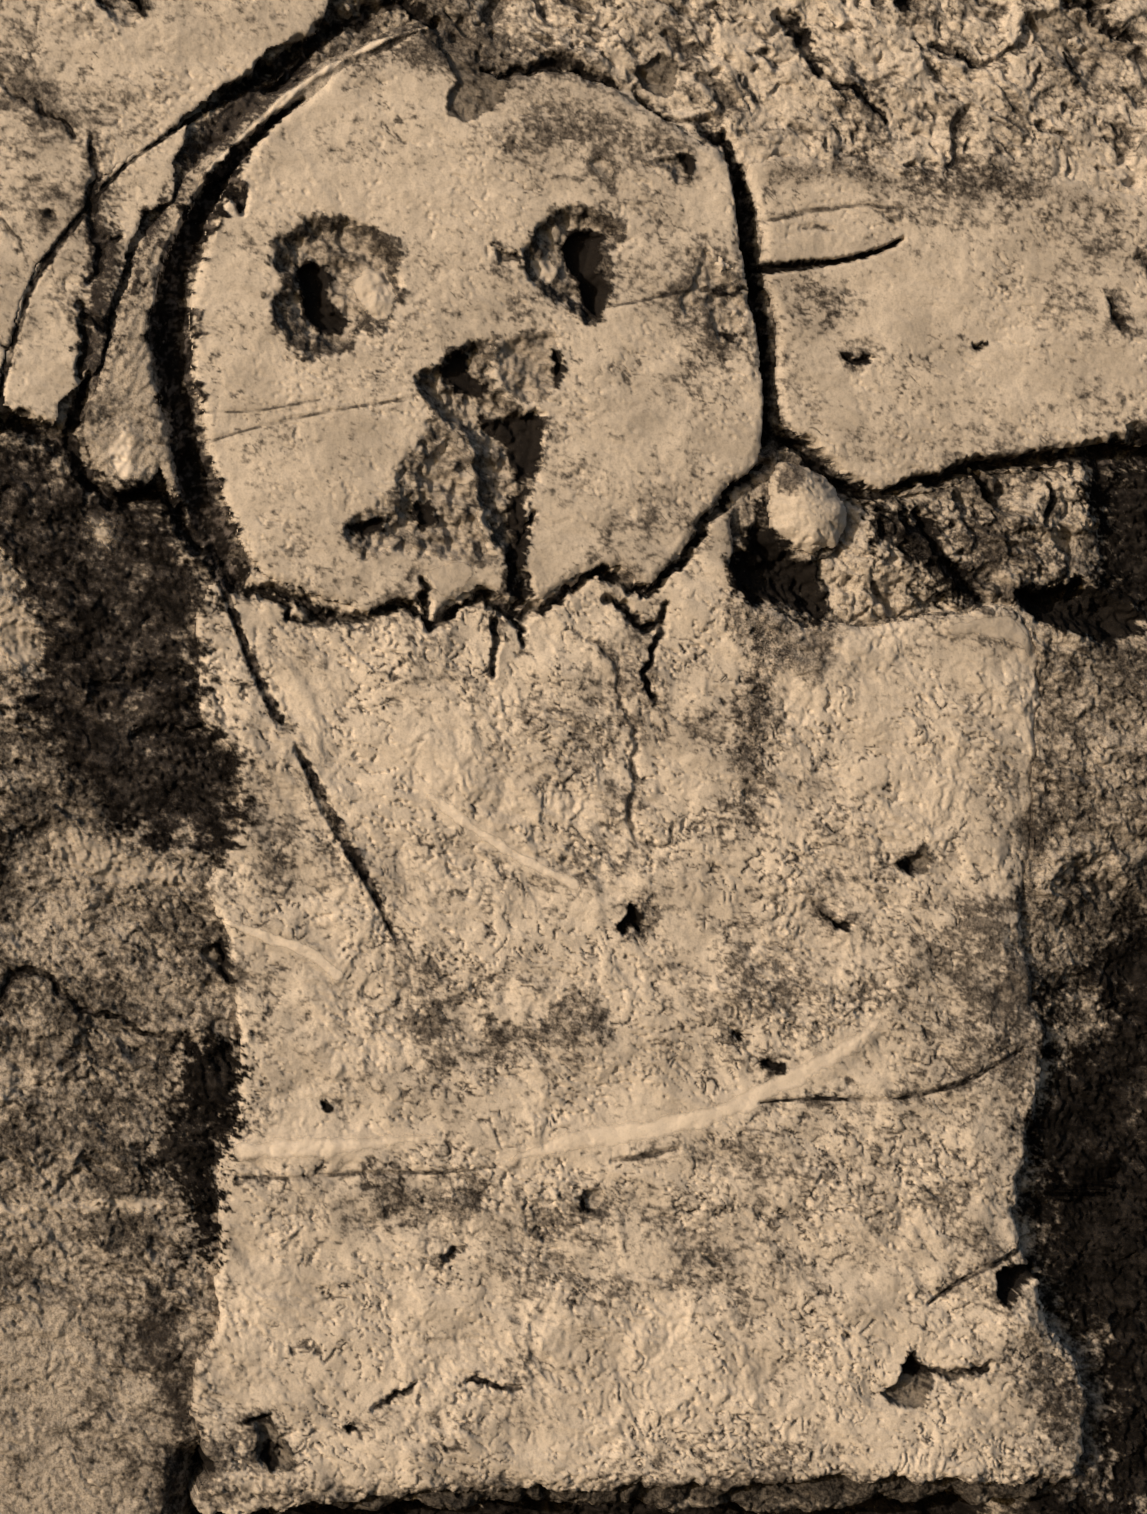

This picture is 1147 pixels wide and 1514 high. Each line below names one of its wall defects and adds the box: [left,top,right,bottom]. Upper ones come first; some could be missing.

crack [0,0,1147,943]
spalling [192,1444,216,1476]